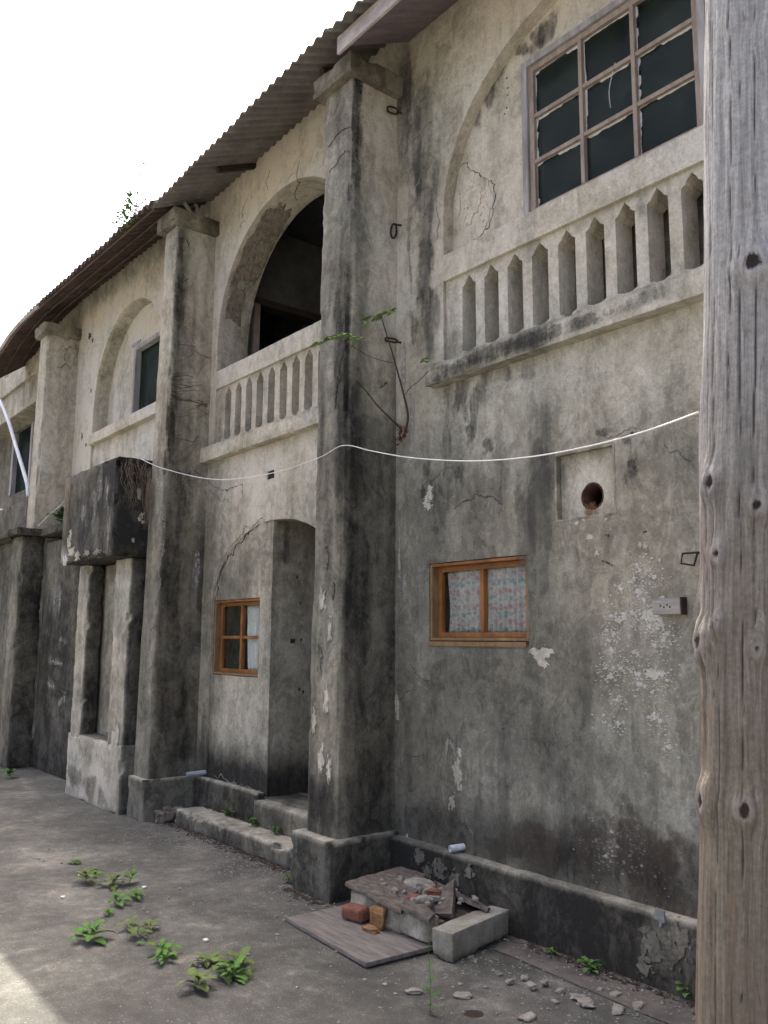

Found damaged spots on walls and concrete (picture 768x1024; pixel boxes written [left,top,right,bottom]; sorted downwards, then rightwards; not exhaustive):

water stain [351,78,363,205]
spalling [225,202,292,327]
spalling [421,485,434,511]
crack [454,494,503,509]
flaking render [63,529,102,566]
crack [214,520,271,603]
spalling [311,546,335,785]
spalling [528,644,555,669]
peeling [585,530,692,762]
water stain [442,738,463,810]
spalling [413,847,476,892]
spalling [636,916,694,979]